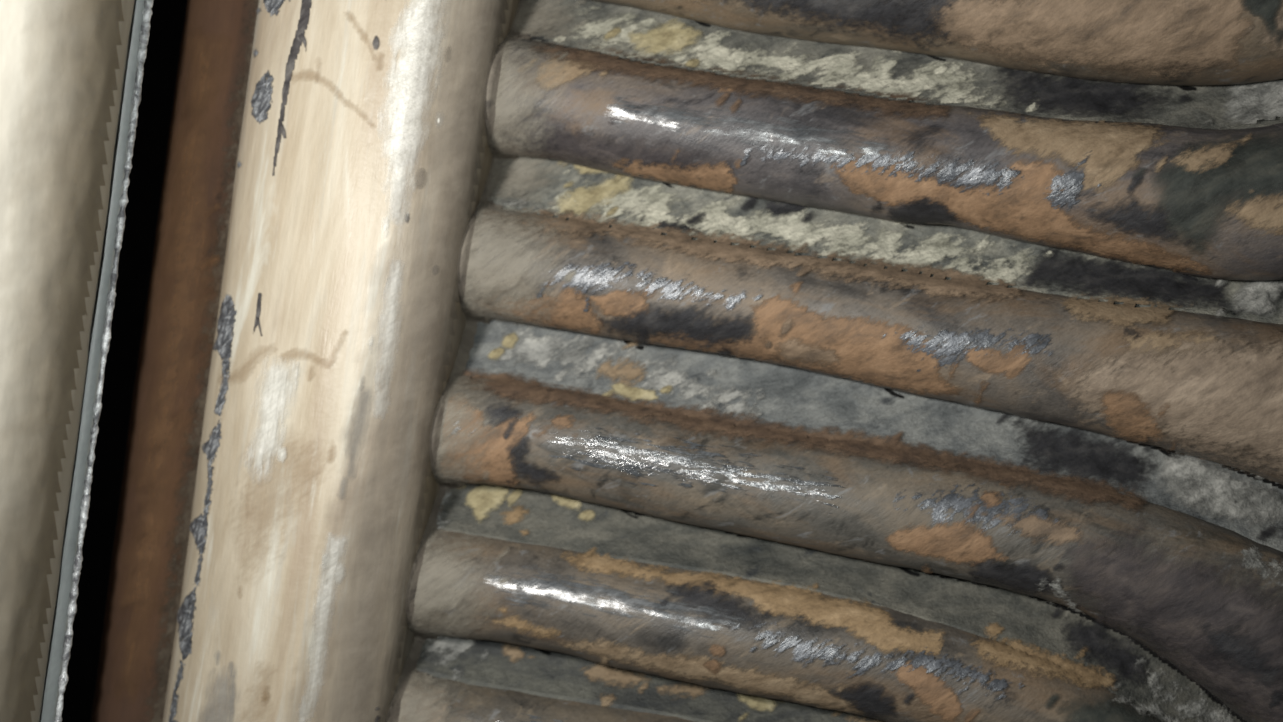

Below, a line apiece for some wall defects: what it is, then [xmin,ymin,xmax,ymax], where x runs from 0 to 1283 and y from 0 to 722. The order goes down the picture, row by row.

peeling [251,71,273,124]
crack [272,0,311,176]
corrosion [528,43,949,118]
corrosion [614,151,741,192]
water stain [741,197,758,210]
corrosion [831,158,1211,275]
peeling [168,295,237,722]
corrosion [562,640,863,714]
corrosion [891,662,980,722]